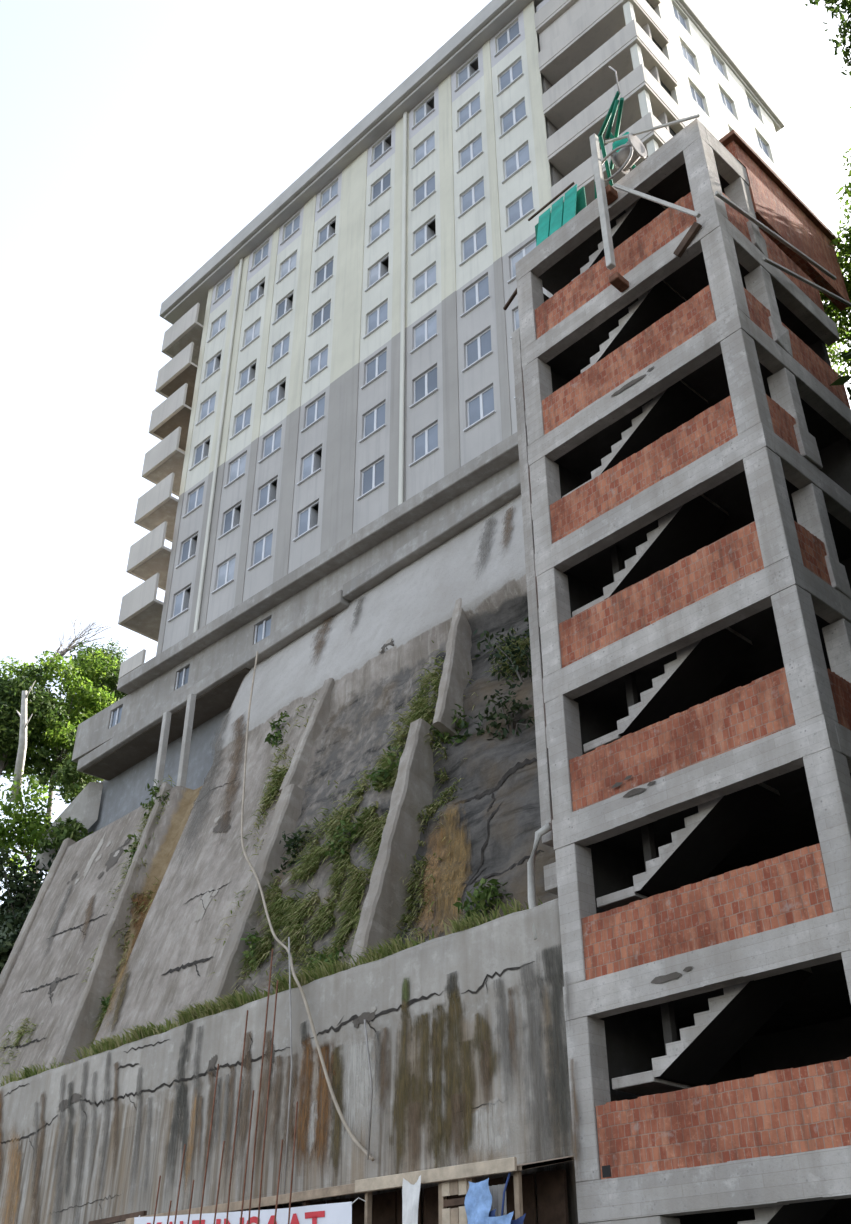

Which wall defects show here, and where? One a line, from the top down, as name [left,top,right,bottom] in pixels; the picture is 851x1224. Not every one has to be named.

water stain [479,506,513,564]
crack [409,757,544,913]
spalling [611,775,656,797]
crack [48,914,107,939]
crack [162,956,212,976]
spalling [651,966,693,983]
water stain [32,1052,118,1224]
water stain [167,1023,281,1182]
crack [0,961,534,1161]
water stain [342,1028,388,1132]
water stain [409,946,579,1172]